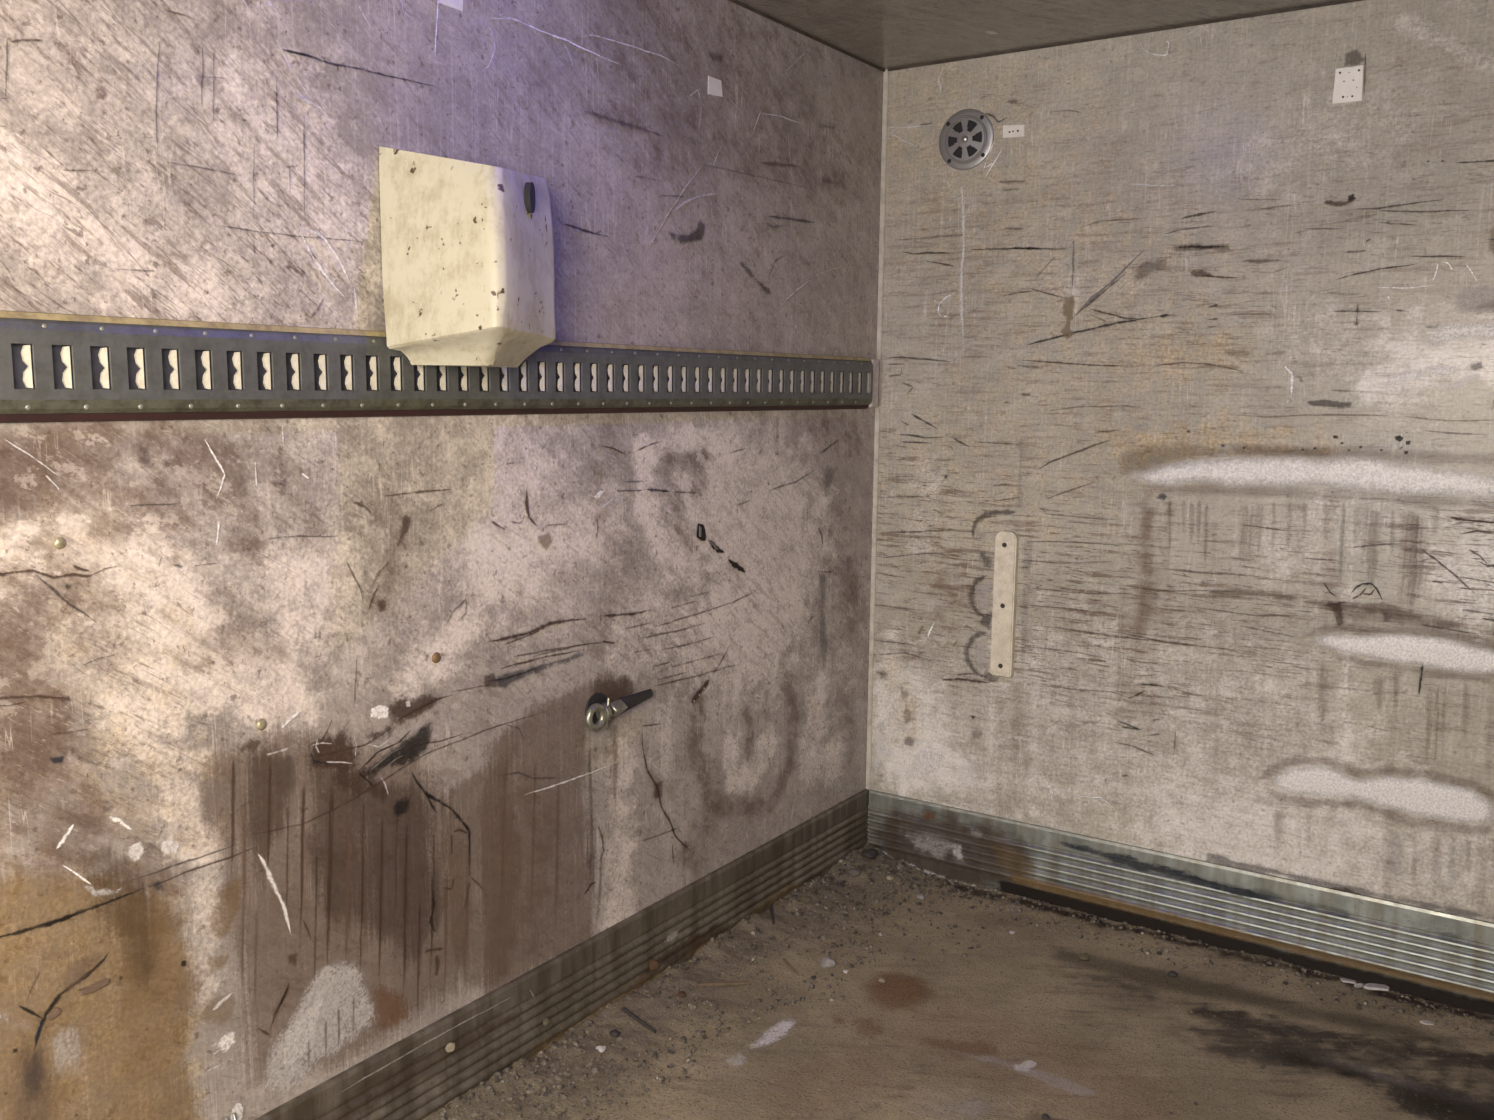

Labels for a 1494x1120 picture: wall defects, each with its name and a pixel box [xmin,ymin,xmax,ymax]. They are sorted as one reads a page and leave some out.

water stain [232,765,246,966]
water stain [265,800,383,1093]